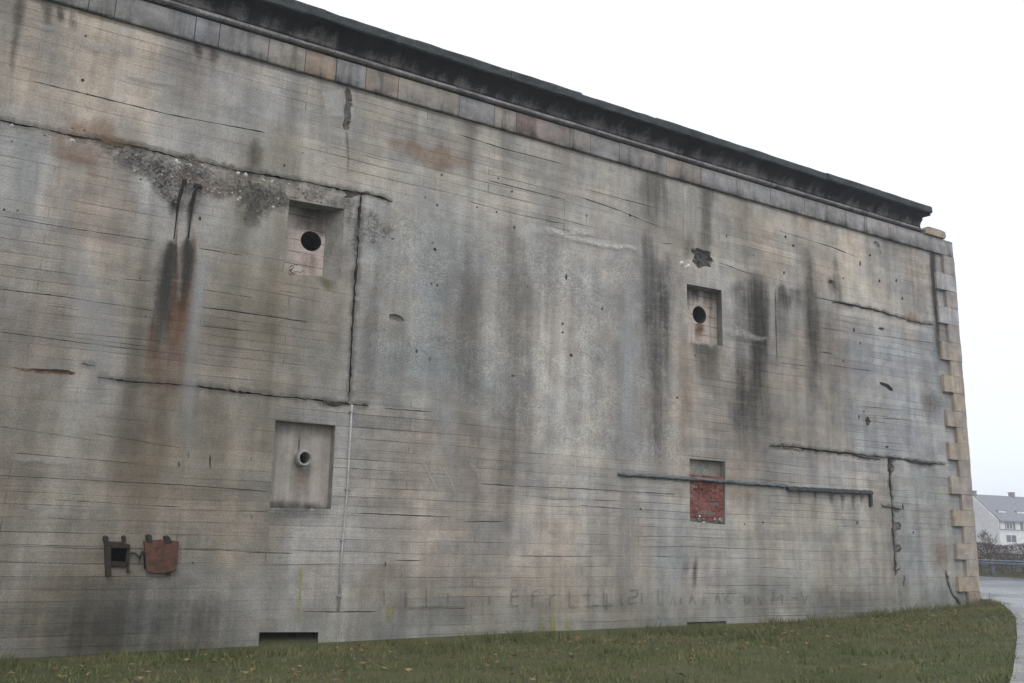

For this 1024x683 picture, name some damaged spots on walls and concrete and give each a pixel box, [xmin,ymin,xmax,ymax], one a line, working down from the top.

spalling [107,145,371,219]
rust [168,236,195,346]
crack [0,118,393,407]
spalling [680,247,714,269]
water stain [748,280,787,408]
crack [833,302,934,326]
crack [769,444,945,585]
crack [945,571,961,606]